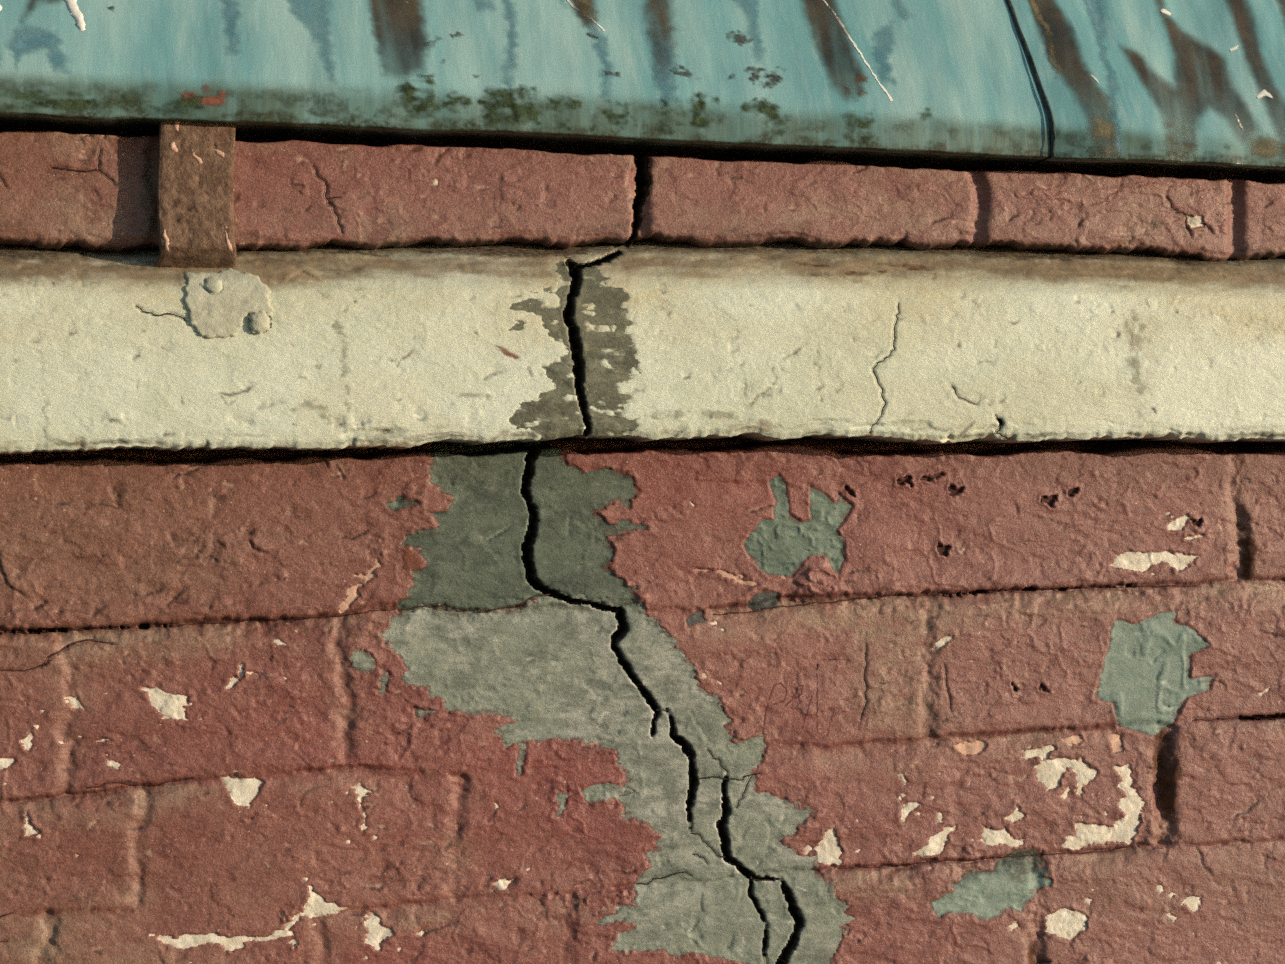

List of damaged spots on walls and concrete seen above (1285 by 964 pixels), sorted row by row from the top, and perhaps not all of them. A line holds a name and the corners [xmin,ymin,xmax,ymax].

rust [183,87,226,105]
crack [52,149,116,185]
crack [312,165,343,233]
crack [136,306,187,321]
crack [563,153,651,439]
spalling [896,472,964,496]
peeling [1110,511,1203,576]
peeling [350,256,860,964]
crack [0,443,803,964]
peeling [1021,612,1213,850]
peeling [898,773,1094,942]
peeling [149,878,348,963]